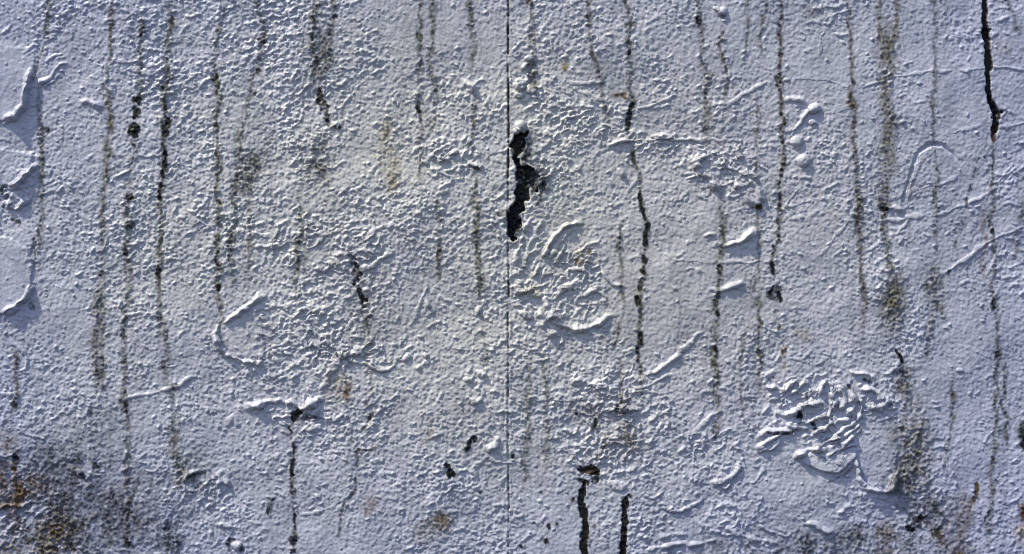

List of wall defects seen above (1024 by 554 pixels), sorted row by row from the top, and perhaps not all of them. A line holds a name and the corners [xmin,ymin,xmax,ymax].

peeling [0,45,35,124]
peeling [0,149,37,224]
leakage [127,24,144,147]
leakage [157,17,174,215]
peeling [498,131,547,242]
leakage [756,13,786,374]
crack [948,0,1003,274]
peeling [0,237,33,317]
leakage [622,151,651,373]
leakage [288,409,317,552]
leakage [572,464,600,554]
leakage [619,494,632,554]